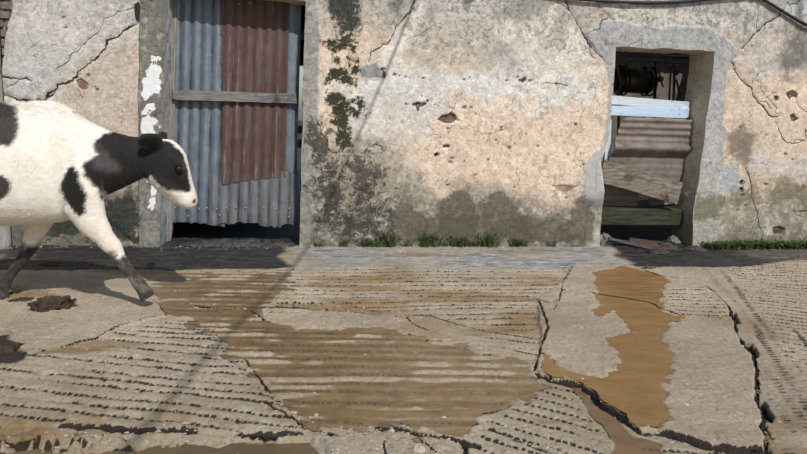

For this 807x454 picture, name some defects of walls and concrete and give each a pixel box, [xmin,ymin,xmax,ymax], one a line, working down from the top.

spalling [0,2,13,68]
crack [2,7,138,102]
peeling [140,56,162,134]
damp [328,0,363,43]
crack [368,0,415,62]
crack [557,0,608,58]
crack [732,0,807,144]
peeling [146,181,157,211]
damp [303,114,400,244]
crack [746,170,765,233]